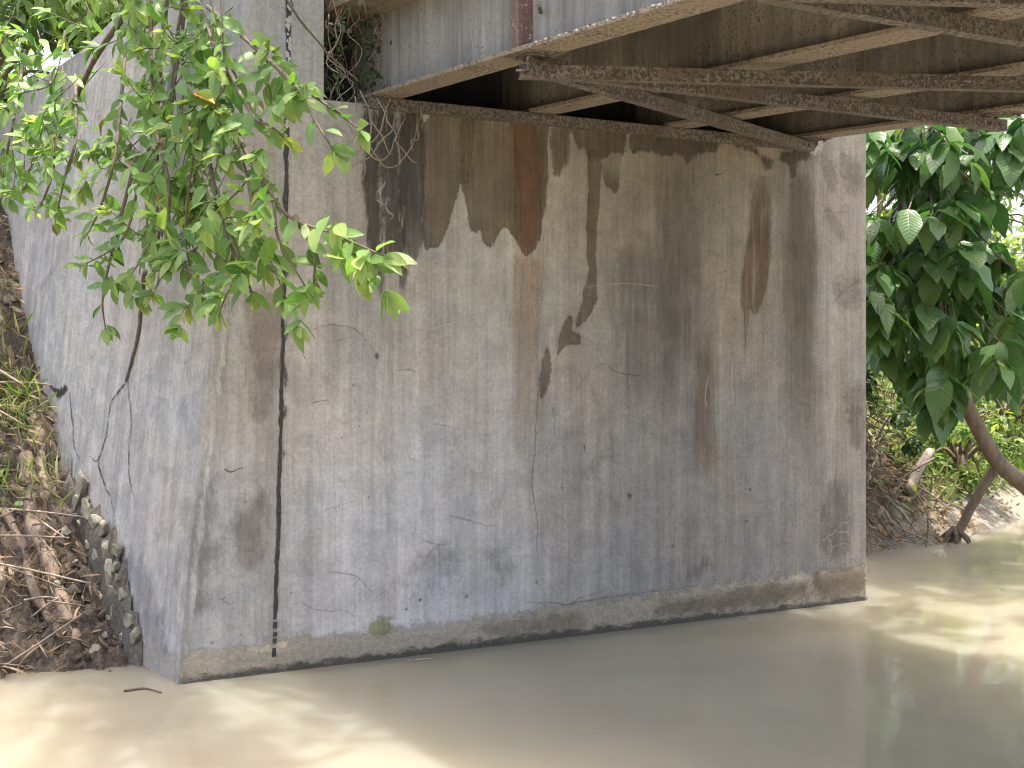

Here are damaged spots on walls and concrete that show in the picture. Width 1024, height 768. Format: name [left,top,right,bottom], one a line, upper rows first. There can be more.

damp [361,110,719,398]
corrosion [741,190,770,341]
crack [69,362,135,509]
damp [128,535,868,684]